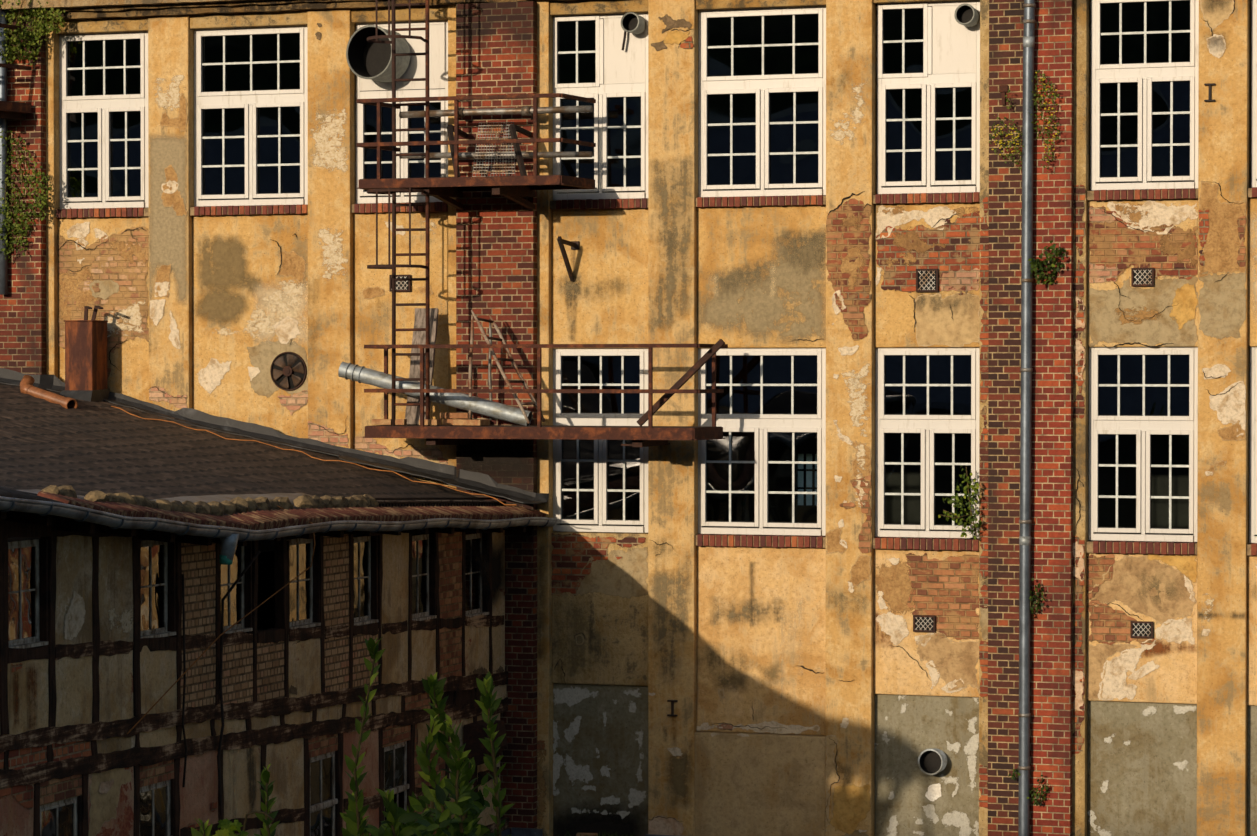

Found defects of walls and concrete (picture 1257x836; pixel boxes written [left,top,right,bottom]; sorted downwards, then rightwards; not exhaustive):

peeling [651,14,694,51]
spalling [57,222,181,379]
water stain [149,136,259,323]
spalling [212,251,308,416]
water stain [654,160,691,326]
water stain [703,234,825,339]
spalling [1073,180,1257,419]
spalling [308,421,448,465]
spalling [825,197,989,836]
water stain [707,652,745,688]
water stain [714,592,776,622]
peeling [553,686,646,819]